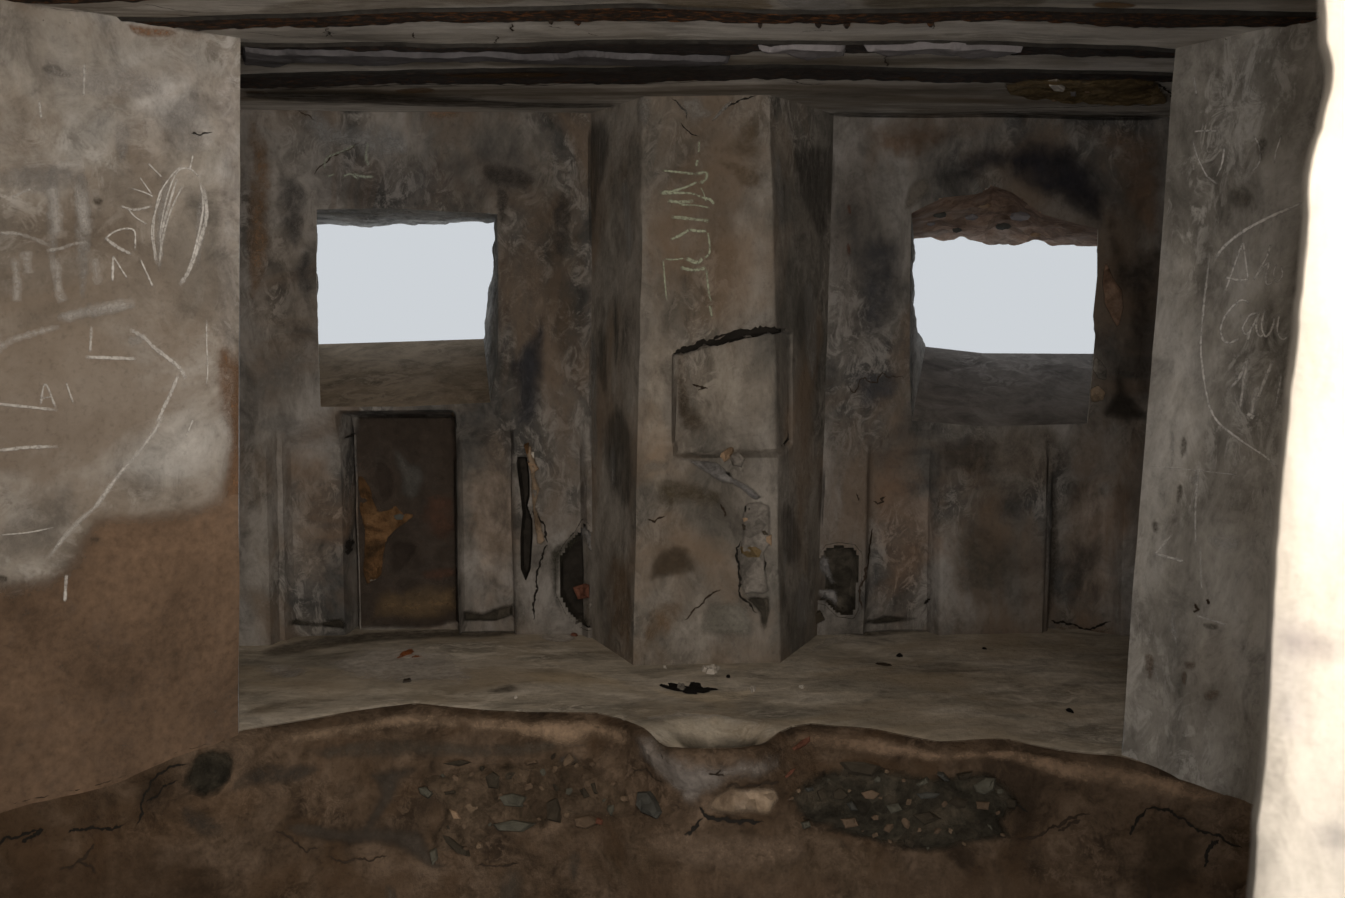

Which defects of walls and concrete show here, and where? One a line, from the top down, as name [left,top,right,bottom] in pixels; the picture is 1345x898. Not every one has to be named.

crack [673,326,785,354]
corrosion [356,415,458,627]
spalling [517,442,544,580]
spalling [555,519,592,631]
spalling [749,597,769,626]
spalling [816,542,904,624]